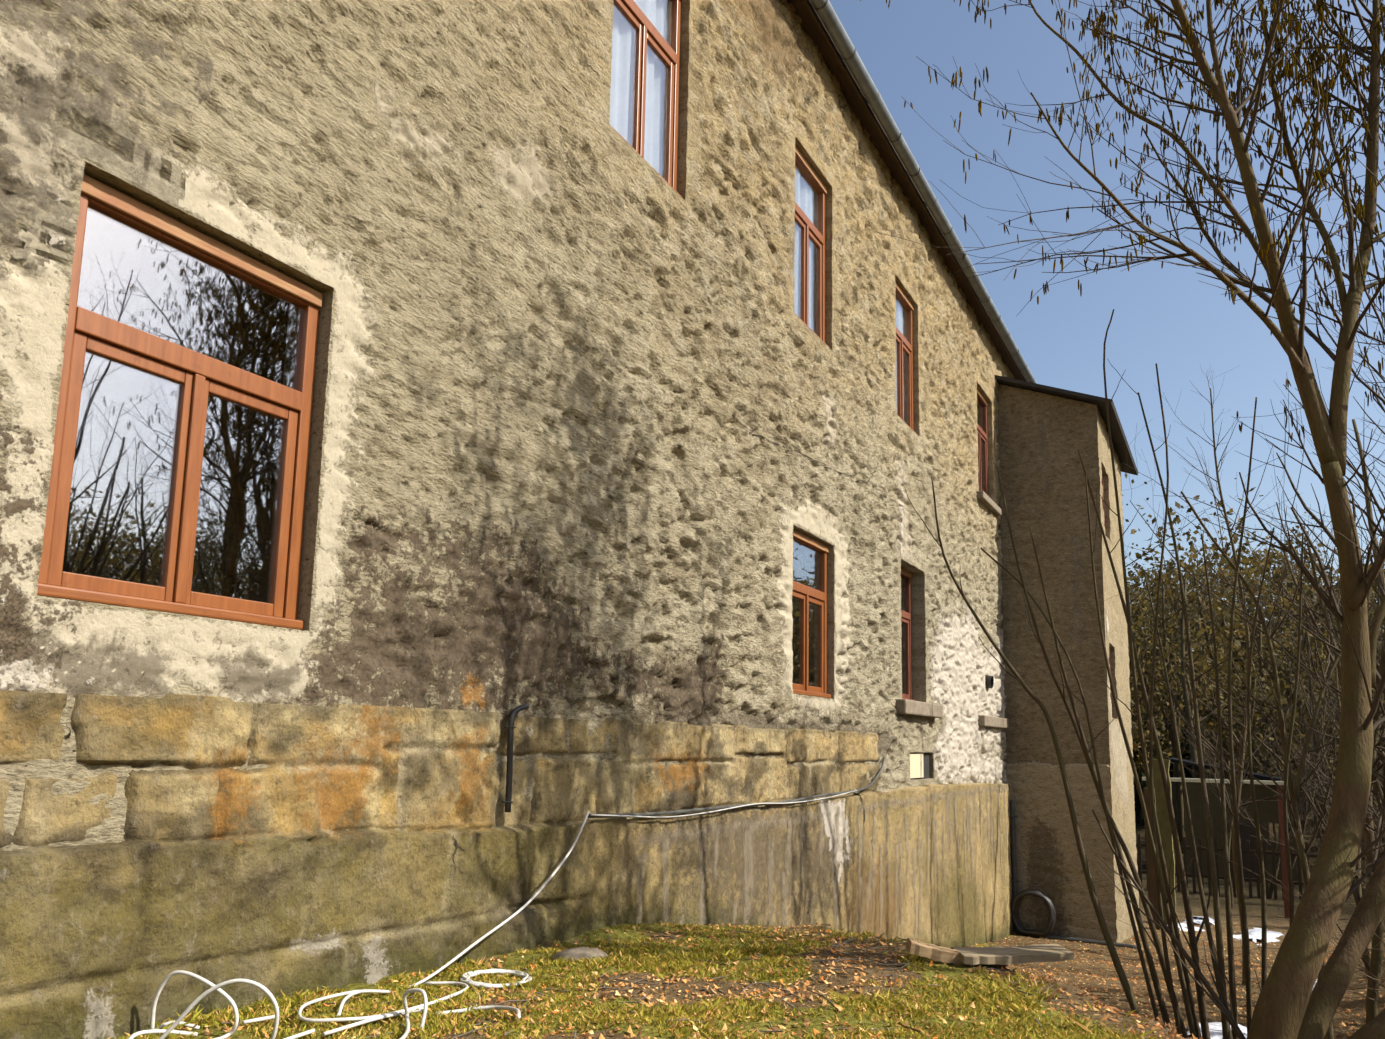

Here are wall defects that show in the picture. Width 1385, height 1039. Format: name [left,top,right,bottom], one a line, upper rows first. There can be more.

damp [0,0,214,274]
damp [0,417,82,691]
damp [267,497,732,733]